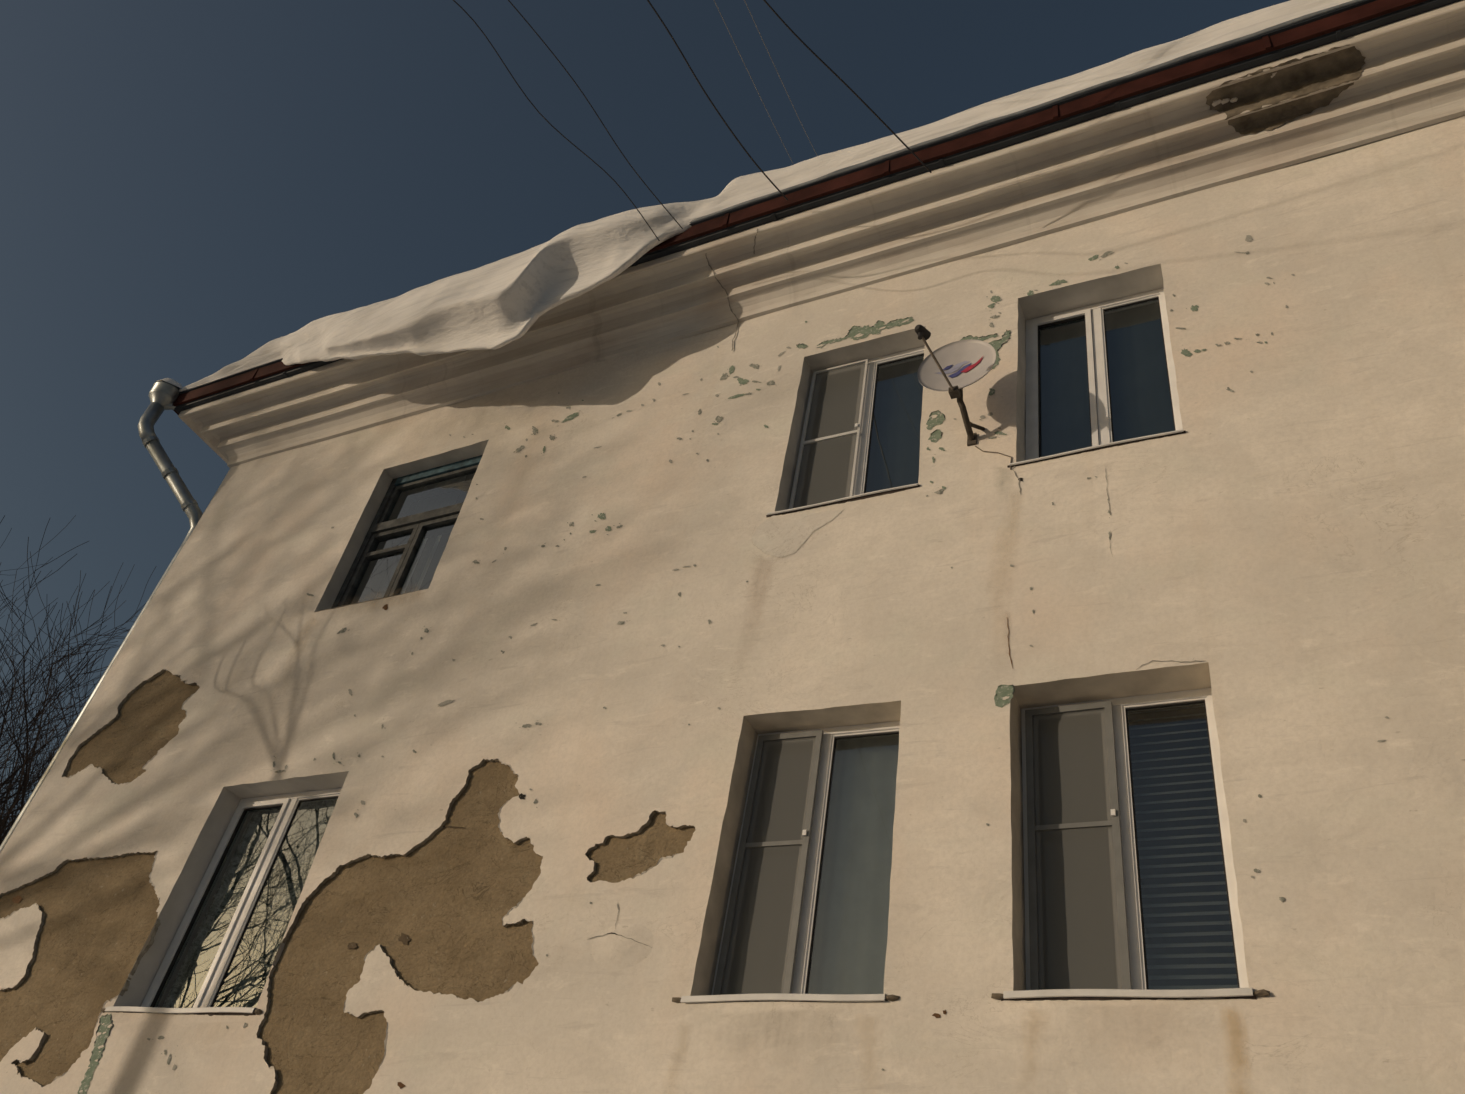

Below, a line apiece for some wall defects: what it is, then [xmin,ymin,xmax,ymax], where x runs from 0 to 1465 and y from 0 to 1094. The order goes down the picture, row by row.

crack [705,253,739,351]
peeling [715,317,914,399]
peeling [961,290,1011,369]
peeling [979,388,1006,439]
flaking render [62,669,200,785]
flaking render [587,813,695,883]
flaking render [0,850,160,1094]
flaking render [226,758,548,1094]